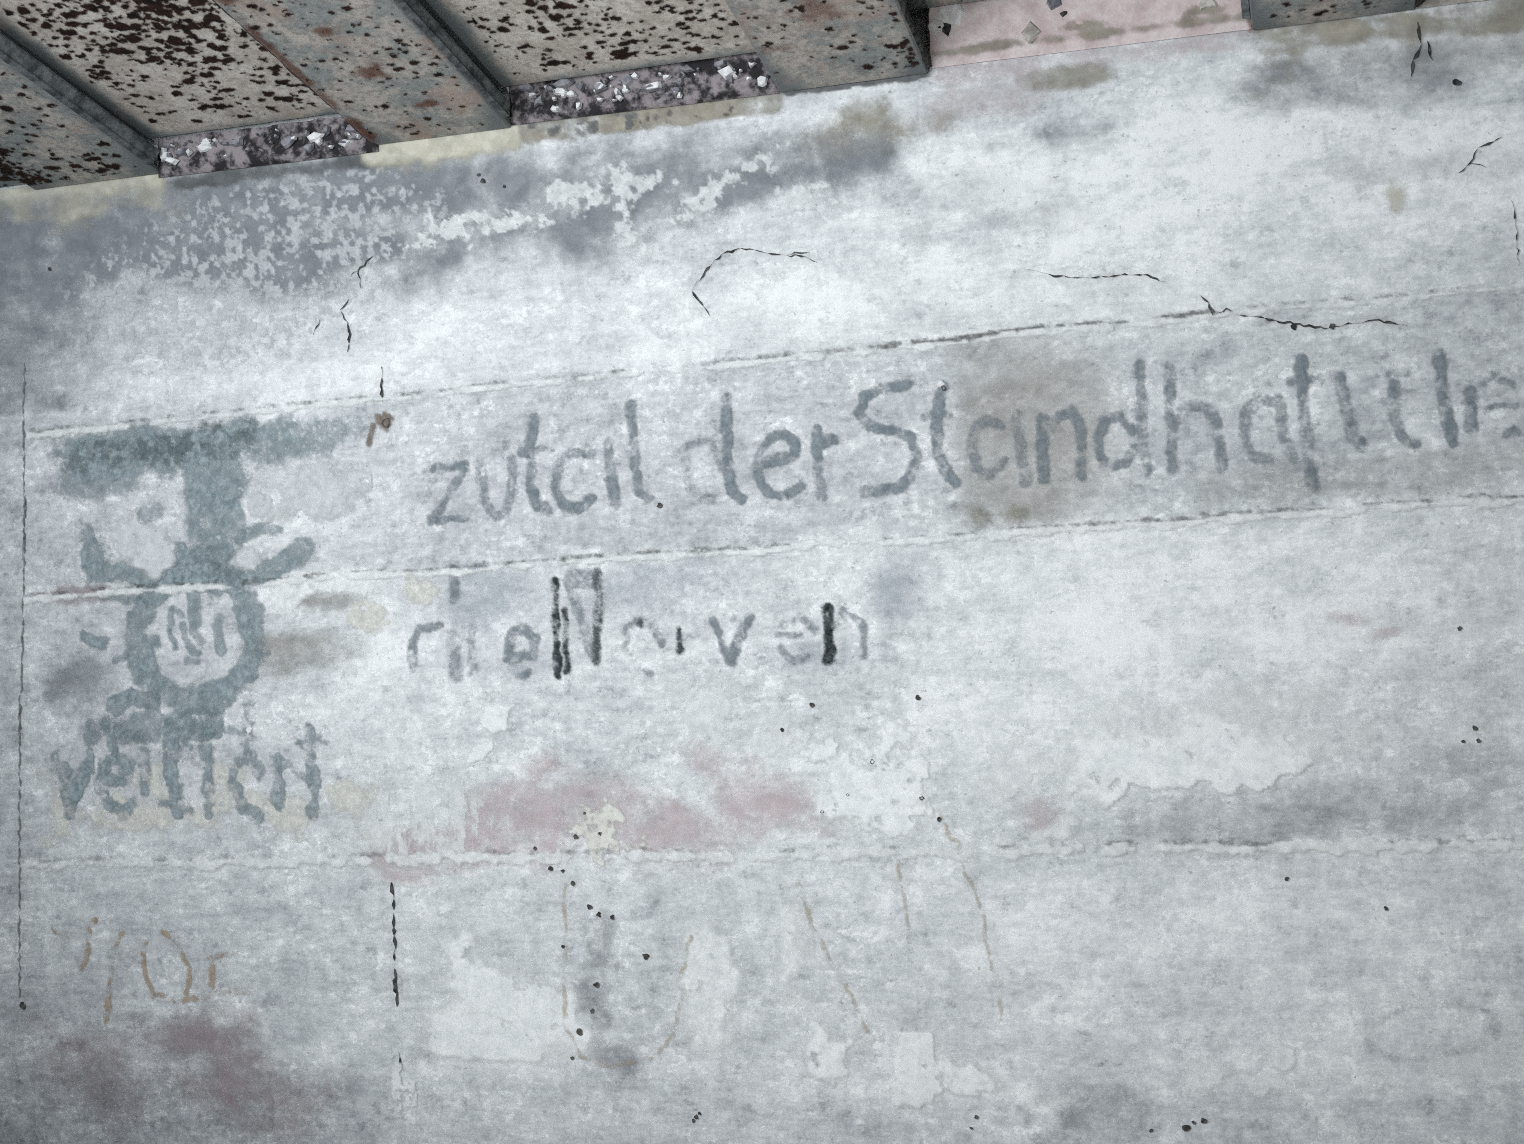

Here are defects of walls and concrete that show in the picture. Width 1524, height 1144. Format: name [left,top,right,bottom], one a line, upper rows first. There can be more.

damp [1008,53,1106,88]
damp [0,91,904,374]
crack [692,248,815,315]